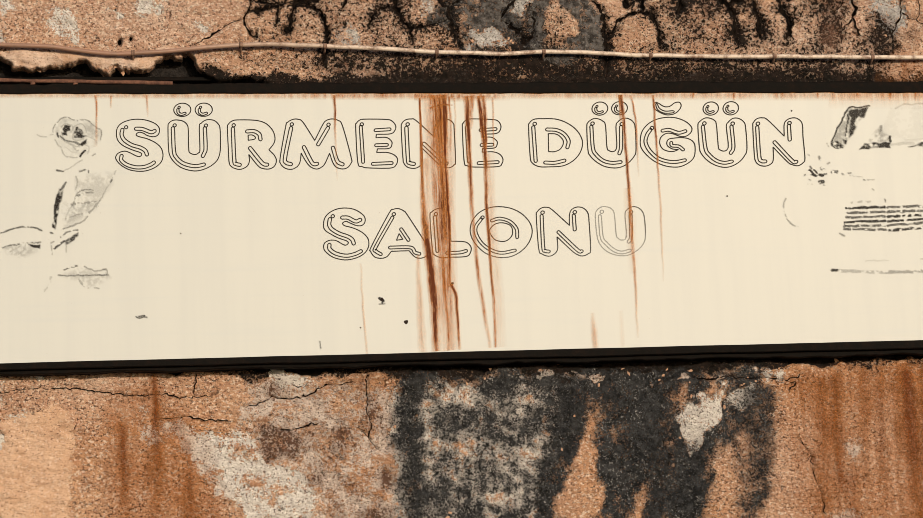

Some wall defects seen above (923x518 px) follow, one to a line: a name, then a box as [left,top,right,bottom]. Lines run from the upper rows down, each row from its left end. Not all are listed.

spalling [0,56,204,85]
crack [196,0,347,63]
damp [189,0,923,84]
crack [593,0,685,69]
crack [719,0,795,42]
crack [0,374,231,422]
corrosion [119,425,128,502]
damp [213,369,287,408]
peeling [135,363,611,518]
damp [259,355,923,518]
corrosion [821,375,864,518]
corrosion [877,367,923,518]